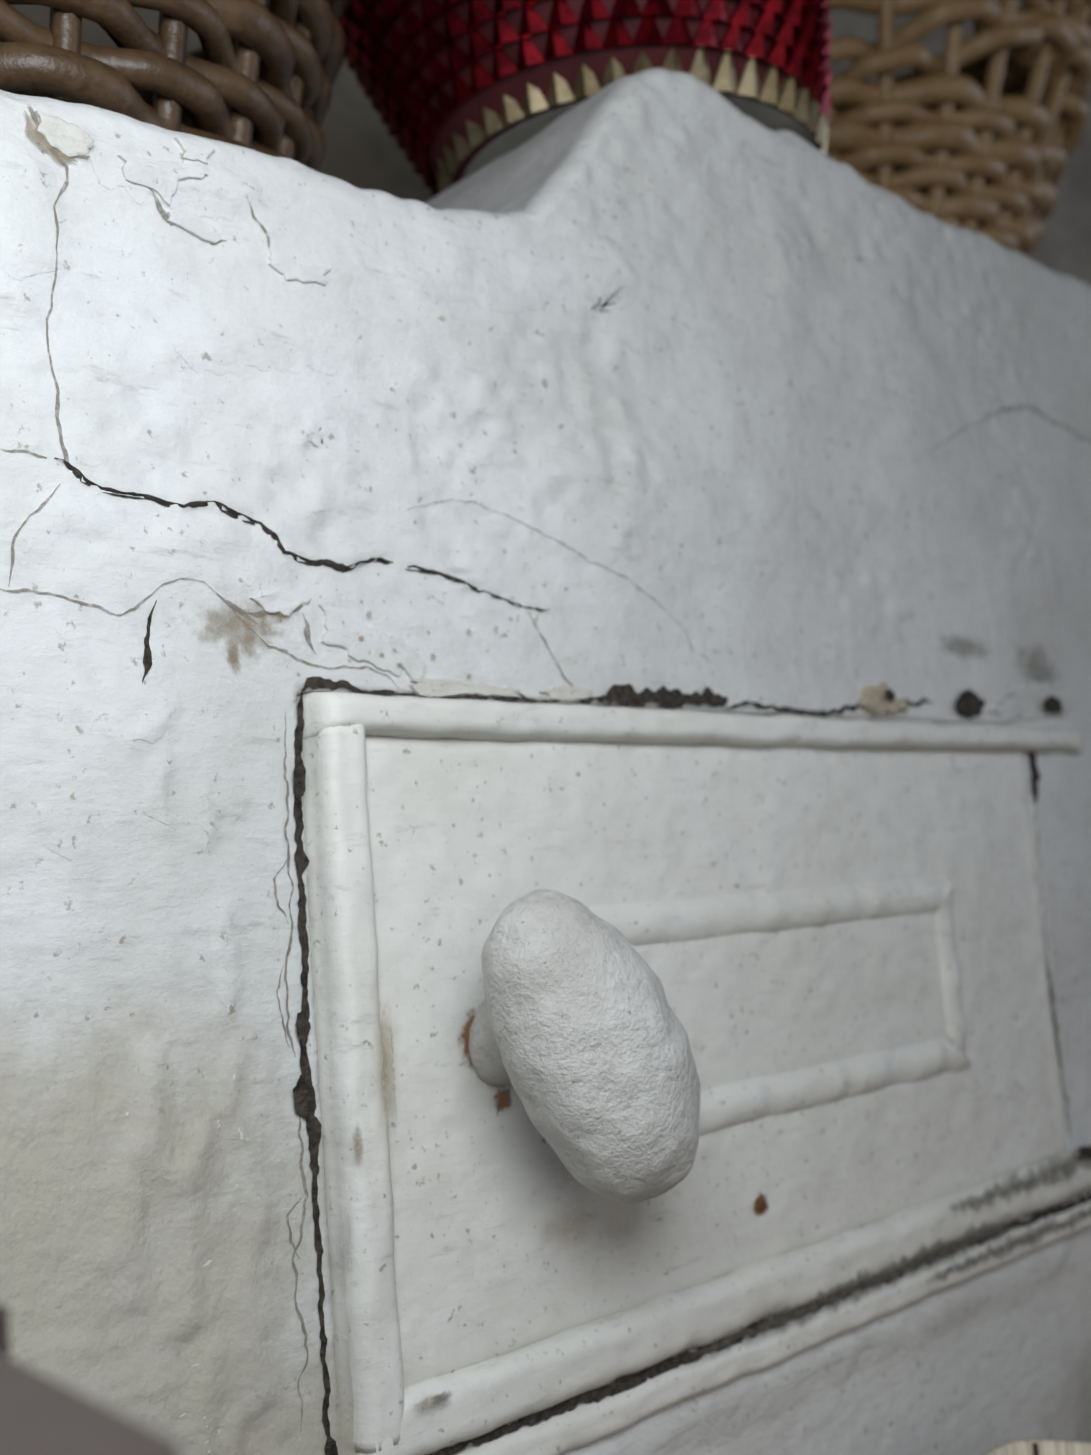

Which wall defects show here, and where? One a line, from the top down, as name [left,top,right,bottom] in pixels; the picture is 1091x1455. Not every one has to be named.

crack [0,107,573,689]
crack [273,712,295,1055]
rust [461,1010,475,1065]
rust [494,1089,511,1111]
crack [286,1114,309,1433]